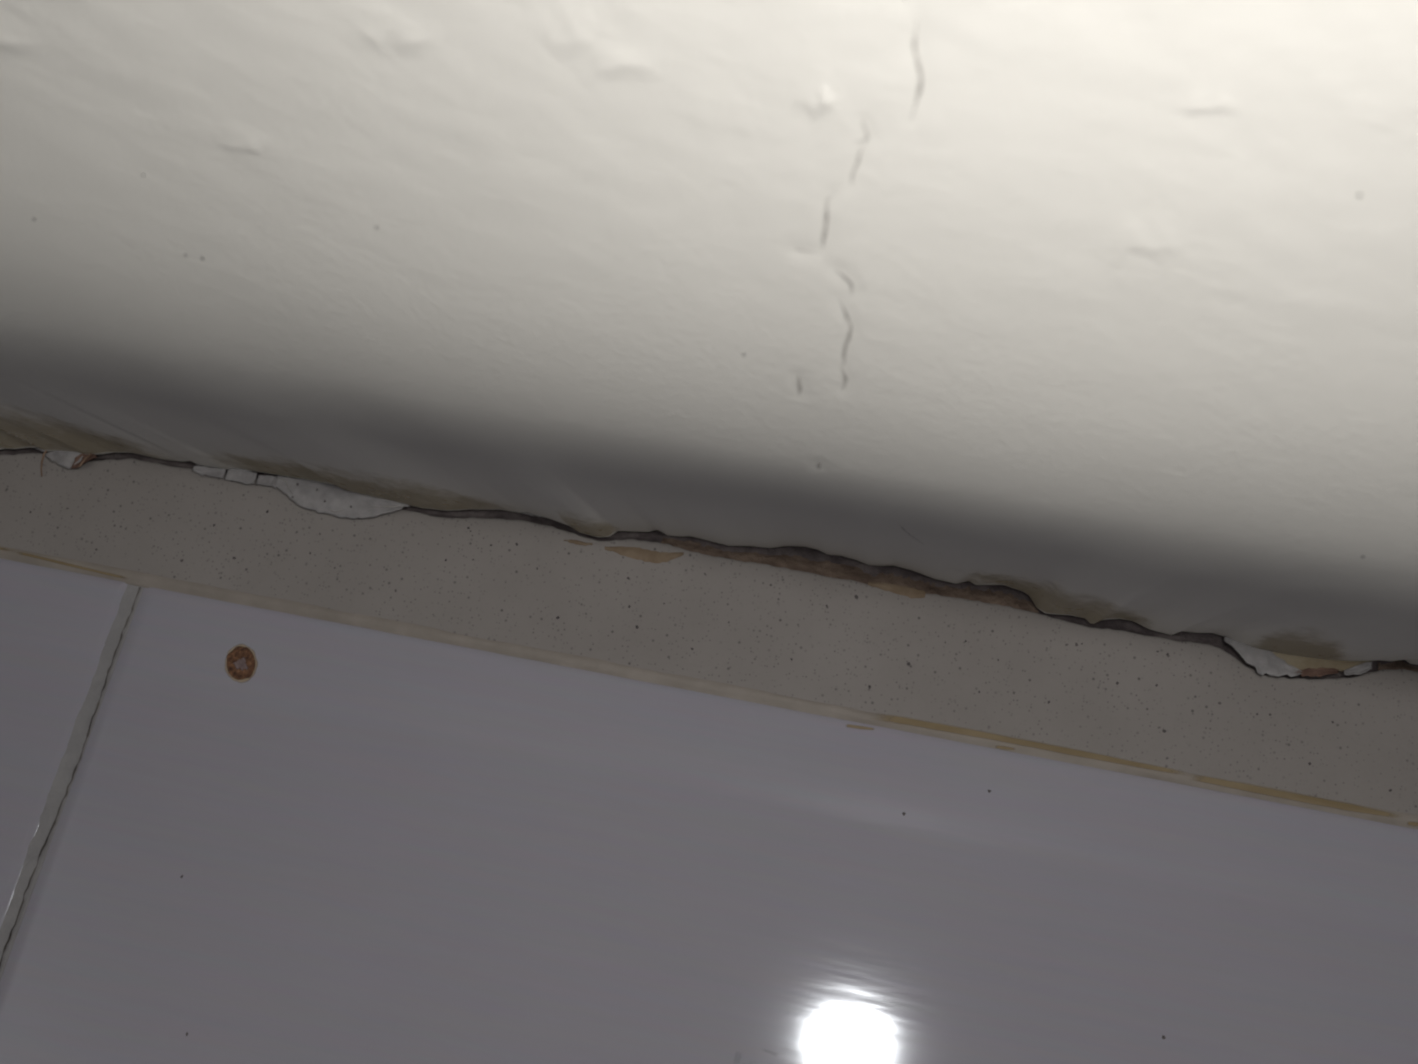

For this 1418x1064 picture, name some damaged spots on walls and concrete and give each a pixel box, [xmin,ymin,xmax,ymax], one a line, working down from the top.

peeling [34,448,97,477]
peeling [193,465,410,519]
spalling [564,538,1039,613]
corrosion [225,644,258,682]
peeling [1224,636,1418,677]